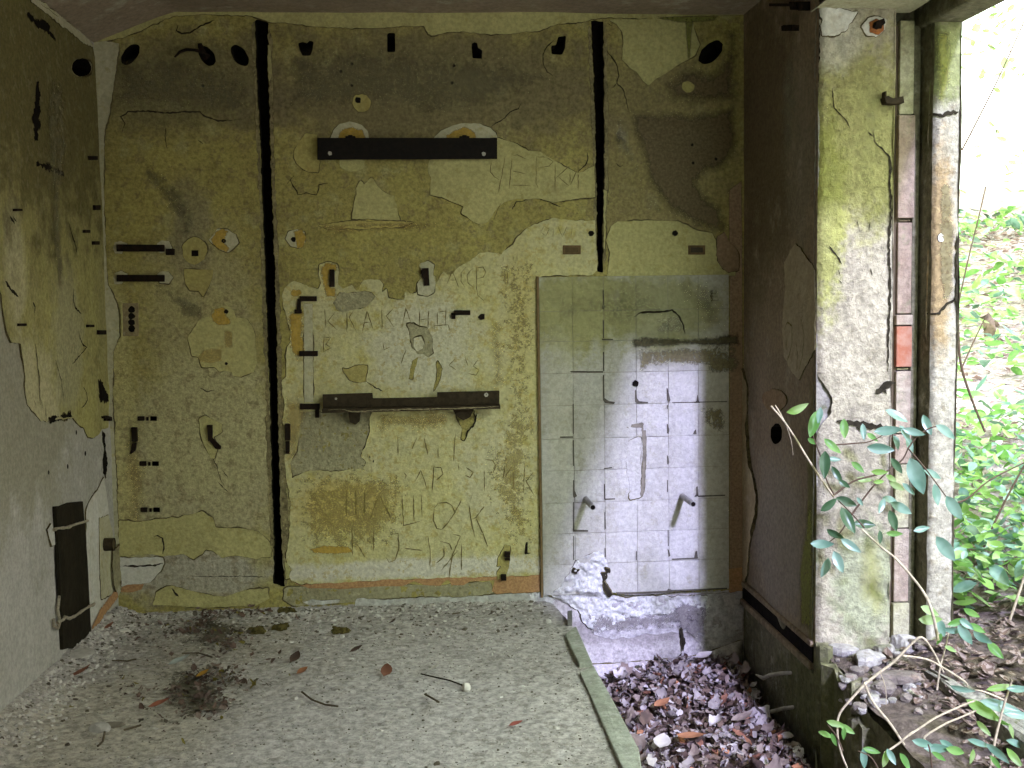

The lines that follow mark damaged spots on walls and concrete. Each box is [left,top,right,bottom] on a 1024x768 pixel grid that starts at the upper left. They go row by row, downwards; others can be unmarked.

peeling [0,0,742,626]
damp [635,33,735,229]
flaking render [819,8,887,38]
crack [818,13,892,372]
spalling [552,368,817,768]